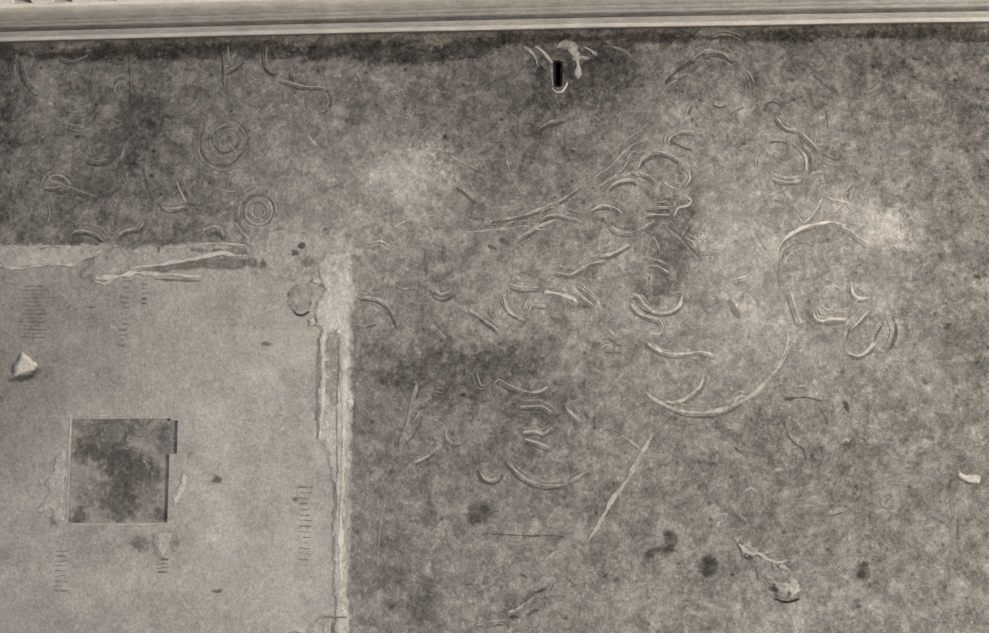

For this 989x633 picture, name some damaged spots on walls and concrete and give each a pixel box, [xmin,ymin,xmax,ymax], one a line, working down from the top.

peeling [0,227,365,633]